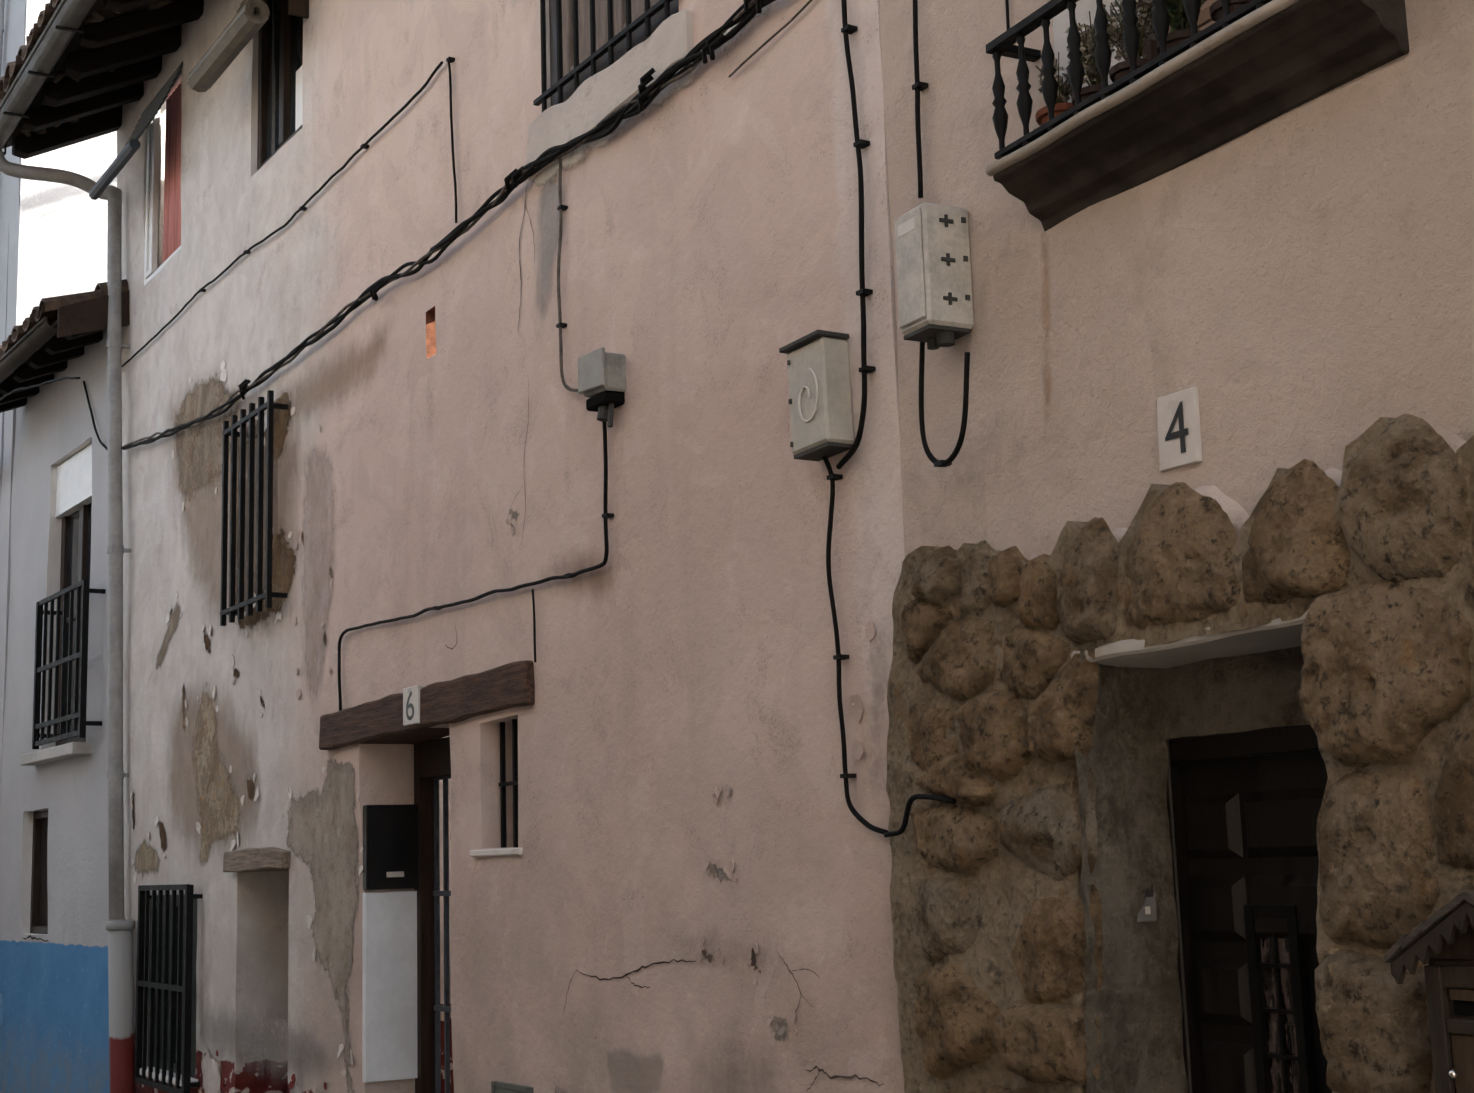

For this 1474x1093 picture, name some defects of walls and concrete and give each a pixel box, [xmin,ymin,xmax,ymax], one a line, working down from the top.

peeling [172,360,245,511]
spalling [264,392,296,461]
peeling [156,591,182,669]
spalling [202,624,211,654]
peeling [182,654,259,864]
peeling [130,791,167,884]
peeling [281,758,363,1093]
crack [563,959,696,1014]
crack [778,953,820,1013]
peeling [201,1047,224,1093]
crack [806,1065,884,1092]